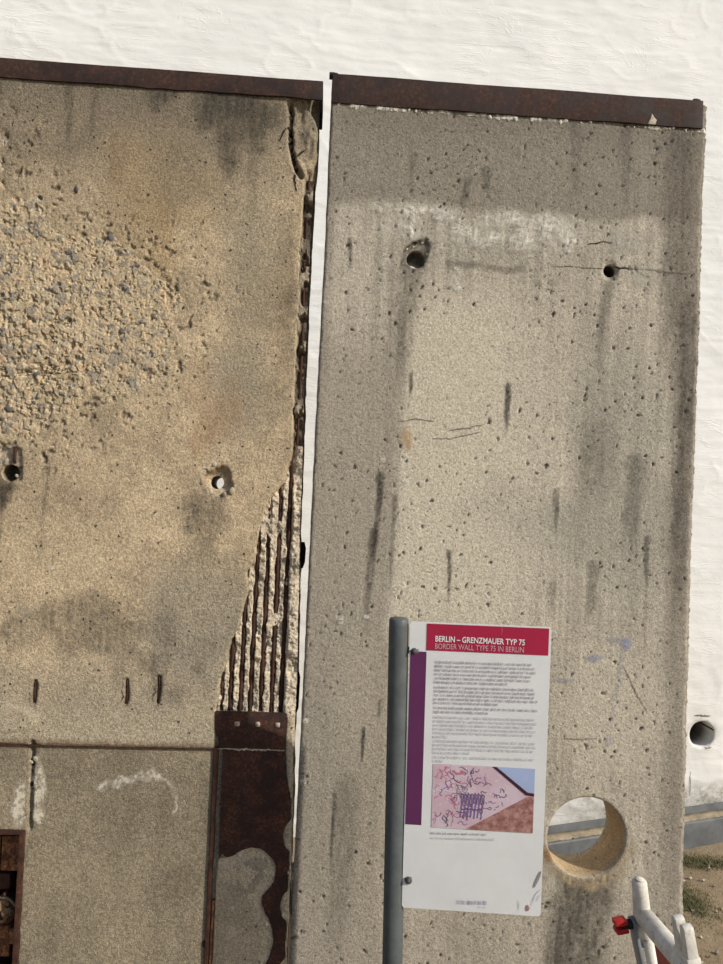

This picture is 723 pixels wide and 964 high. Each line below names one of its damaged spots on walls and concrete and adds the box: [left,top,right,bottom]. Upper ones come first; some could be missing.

crack [280,112,306,191]
crack [552,241,700,277]
spalling [217,176,314,717]
water stain [371,473,384,548]